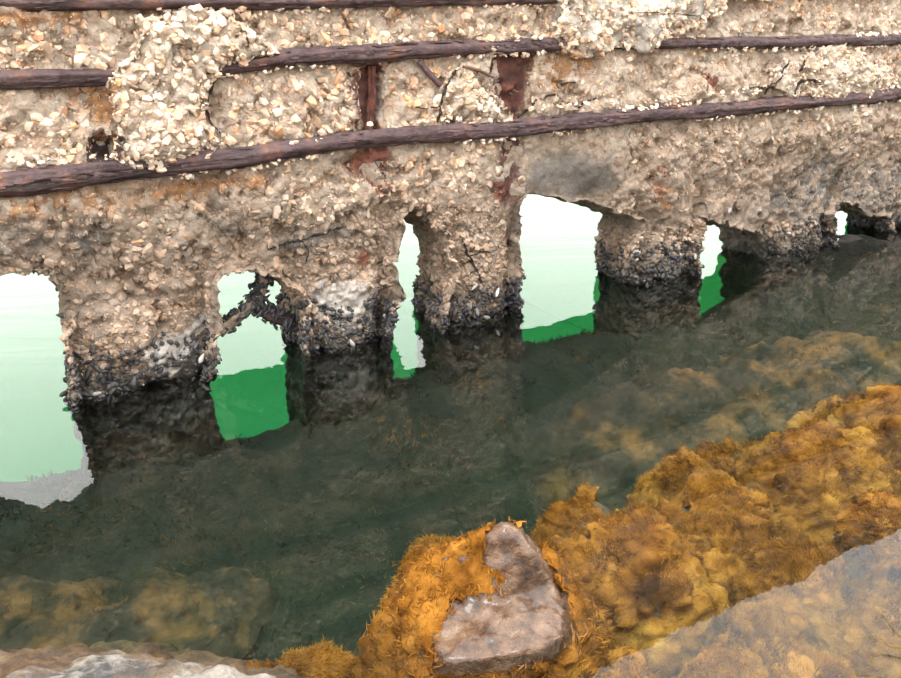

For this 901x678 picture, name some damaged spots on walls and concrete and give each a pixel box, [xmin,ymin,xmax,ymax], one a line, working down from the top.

corrosion [338,62,384,132]
crack [416,70,457,123]
corrosion [488,53,607,120]
crack [749,60,822,95]
corrosion [345,146,392,201]